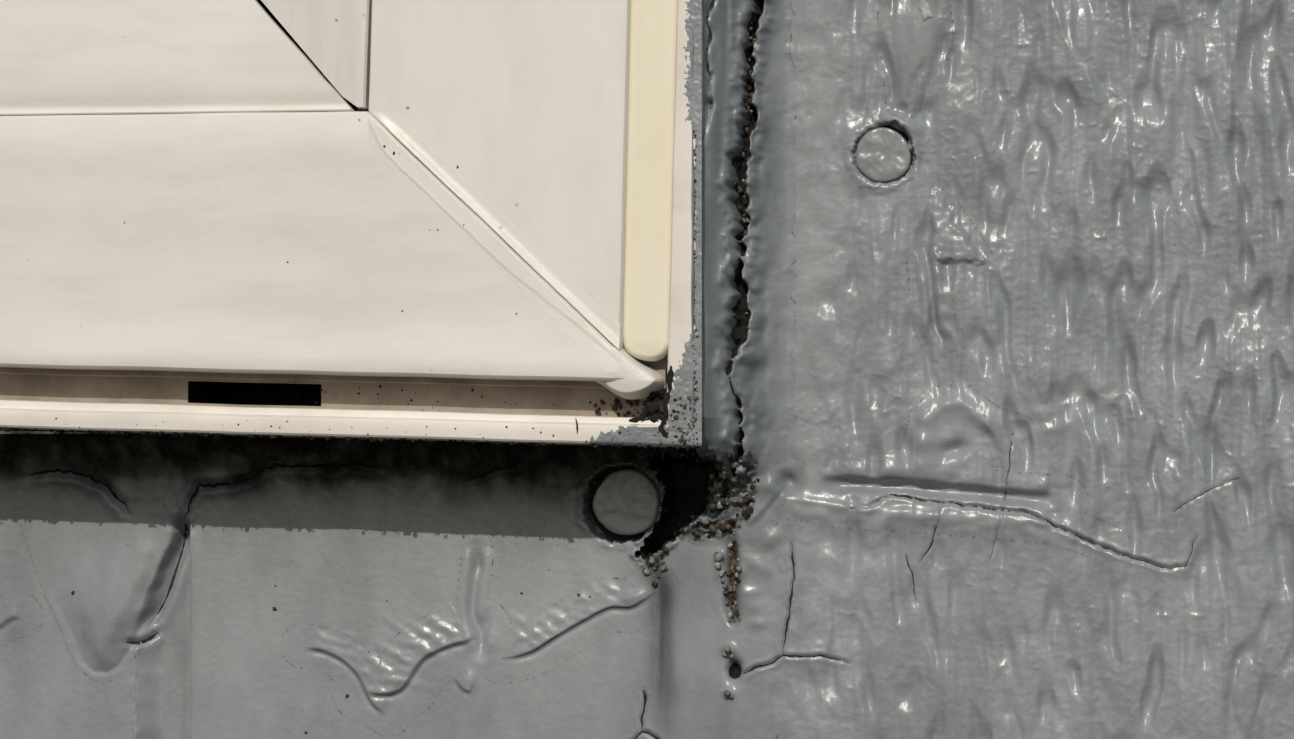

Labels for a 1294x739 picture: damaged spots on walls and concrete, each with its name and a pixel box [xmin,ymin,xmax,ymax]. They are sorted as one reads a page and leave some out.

crack [702,0,715,140]
crack [726,0,764,463]
crack [28,468,132,514]
crack [714,530,742,623]
crack [743,543,849,674]
crack [850,433,1197,605]